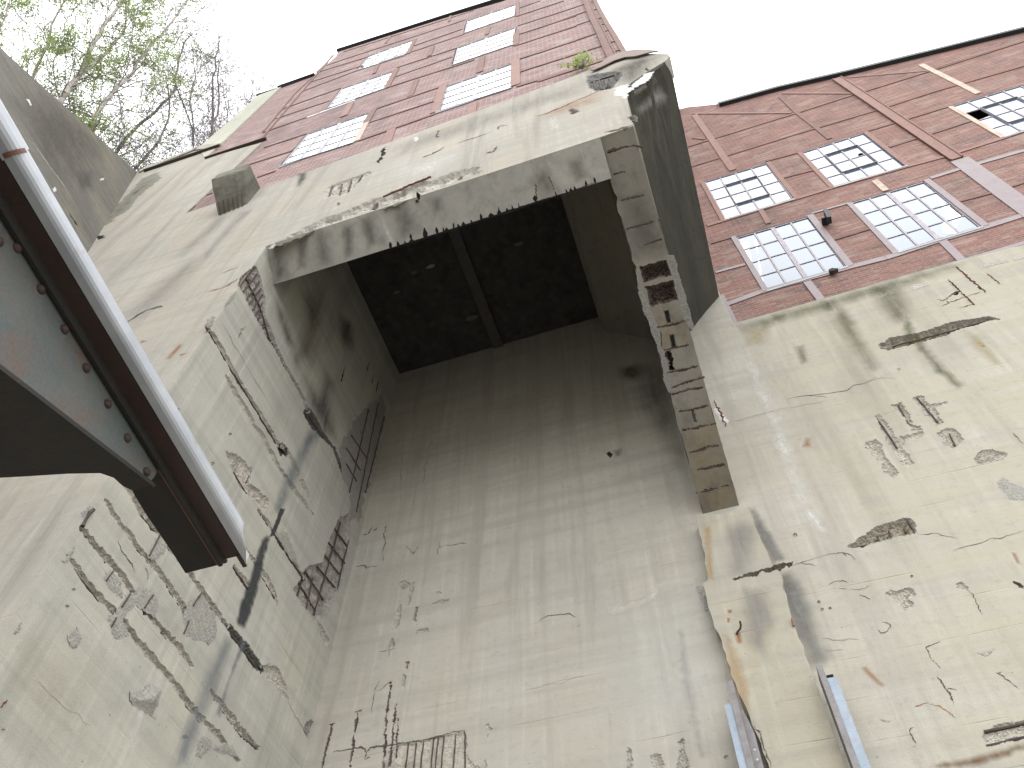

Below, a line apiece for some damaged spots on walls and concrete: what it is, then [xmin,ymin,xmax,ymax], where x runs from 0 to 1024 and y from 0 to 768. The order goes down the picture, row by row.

spalling [635,255,705,395]
spalling [878,316,1001,350]
spalling [225,265,386,645]
spalling [865,395,965,478]
spalling [847,518,918,548]
spalling [61,486,289,765]
spalling [885,575,916,611]
crack [909,642,956,743]
crack [334,730,461,759]